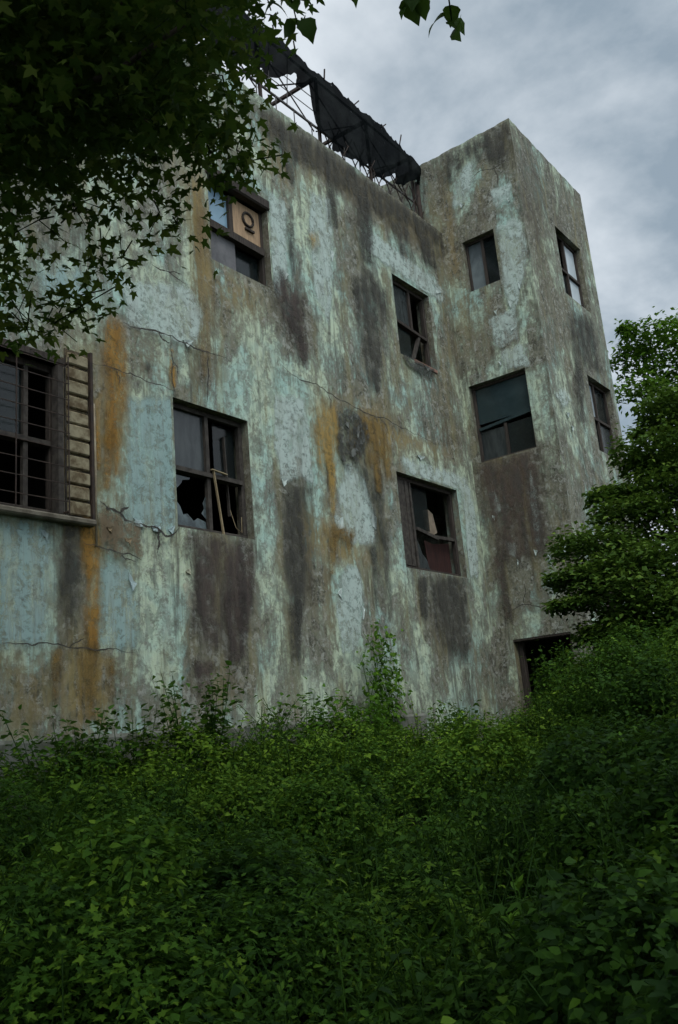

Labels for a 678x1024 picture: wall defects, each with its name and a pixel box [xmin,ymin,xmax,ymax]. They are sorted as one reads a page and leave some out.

leakage [260,110,443,391]
corrosion [96,319,127,486]
crack [95,322,231,400]
corrosion [316,406,340,512]
crack [3,638,133,653]
corrosion [81,526,115,721]
crack [84,501,180,562]
leakage [193,534,253,661]
leakage [284,485,311,658]
leakage [418,575,469,657]